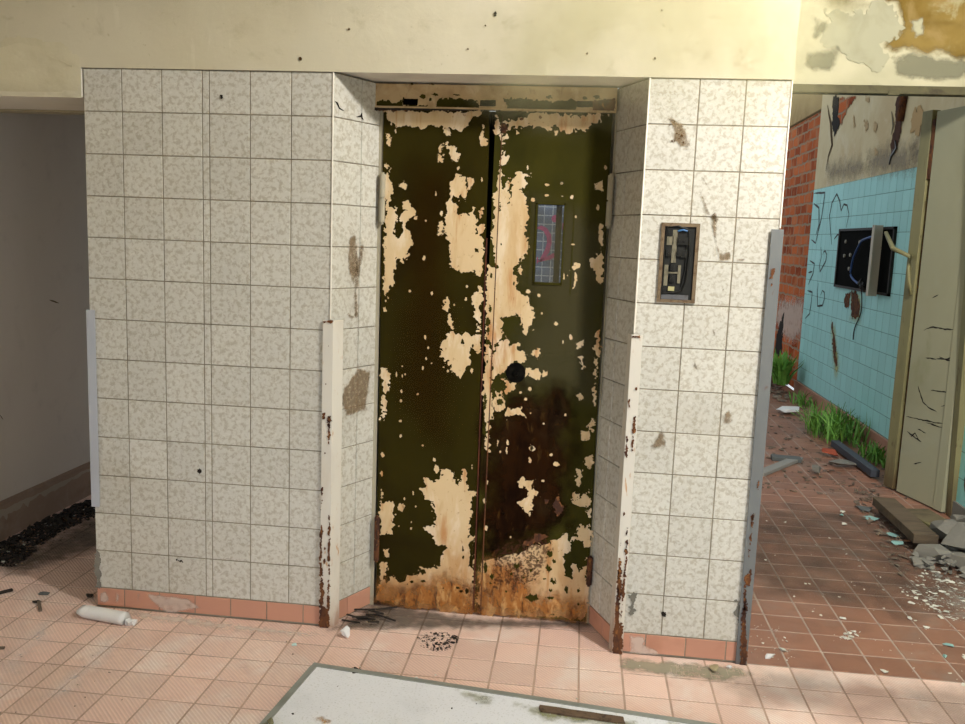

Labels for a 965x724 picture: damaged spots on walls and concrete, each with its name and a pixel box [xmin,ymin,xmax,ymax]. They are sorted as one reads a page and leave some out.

spalling [832,95,877,136]
peeling [890,96,923,153]
peeling [379,110,609,454]
corrosion [342,369,370,415]
corrosion [378,238,588,621]
corrosion [624,387,637,458]
corrosion [318,487,331,628]
peeling [376,455,595,621]
corrosion [612,530,628,655]
corrosion [739,513,754,666]